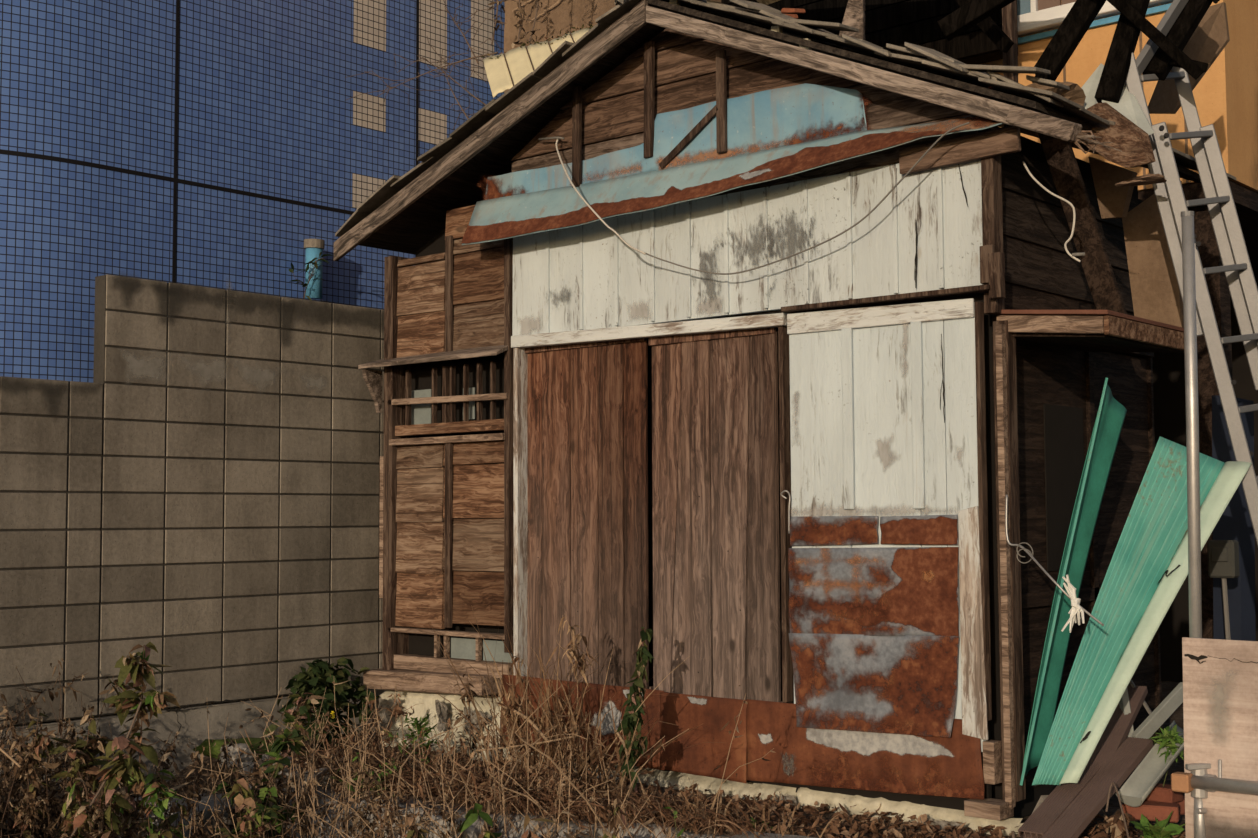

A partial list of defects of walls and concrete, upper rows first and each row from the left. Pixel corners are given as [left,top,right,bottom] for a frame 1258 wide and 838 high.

rust [461,93,1001,244]
leakage [158,286,384,342]
leakage [692,210,815,308]
rust [788,515,959,738]